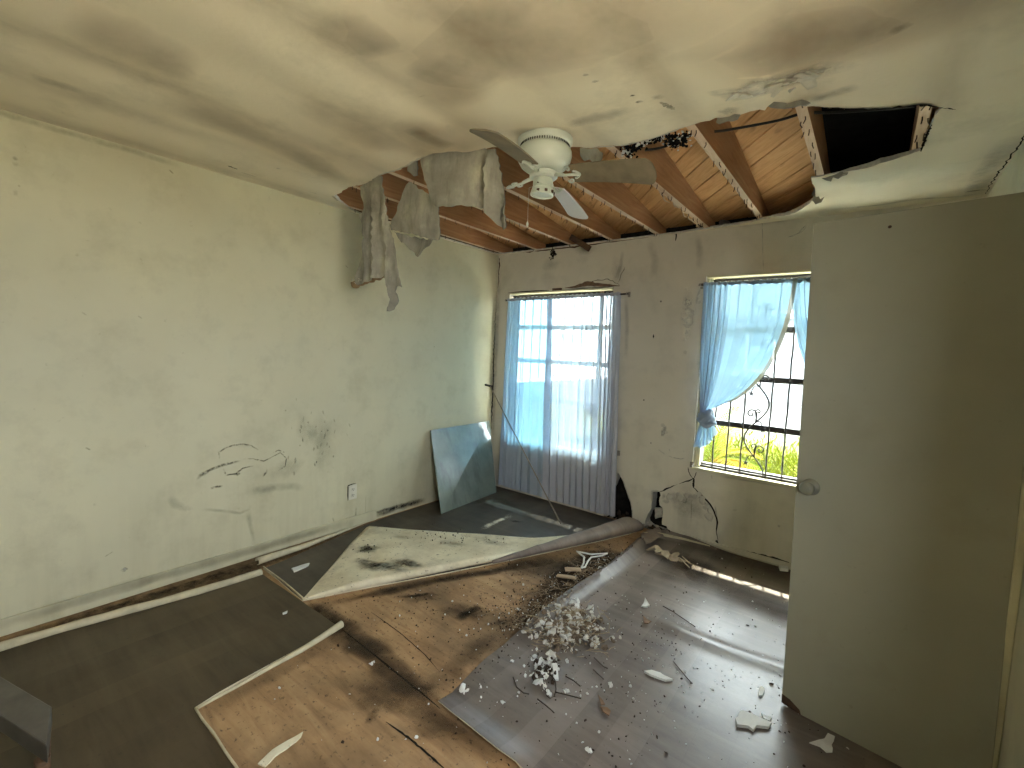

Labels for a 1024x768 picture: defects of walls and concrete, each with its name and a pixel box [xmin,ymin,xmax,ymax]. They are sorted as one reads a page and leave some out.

peeling [621,130,693,158]
crack [985,136,1024,194]
flaking render [510,268,625,293]
spalling [607,473,633,519]
crack [660,469,720,544]